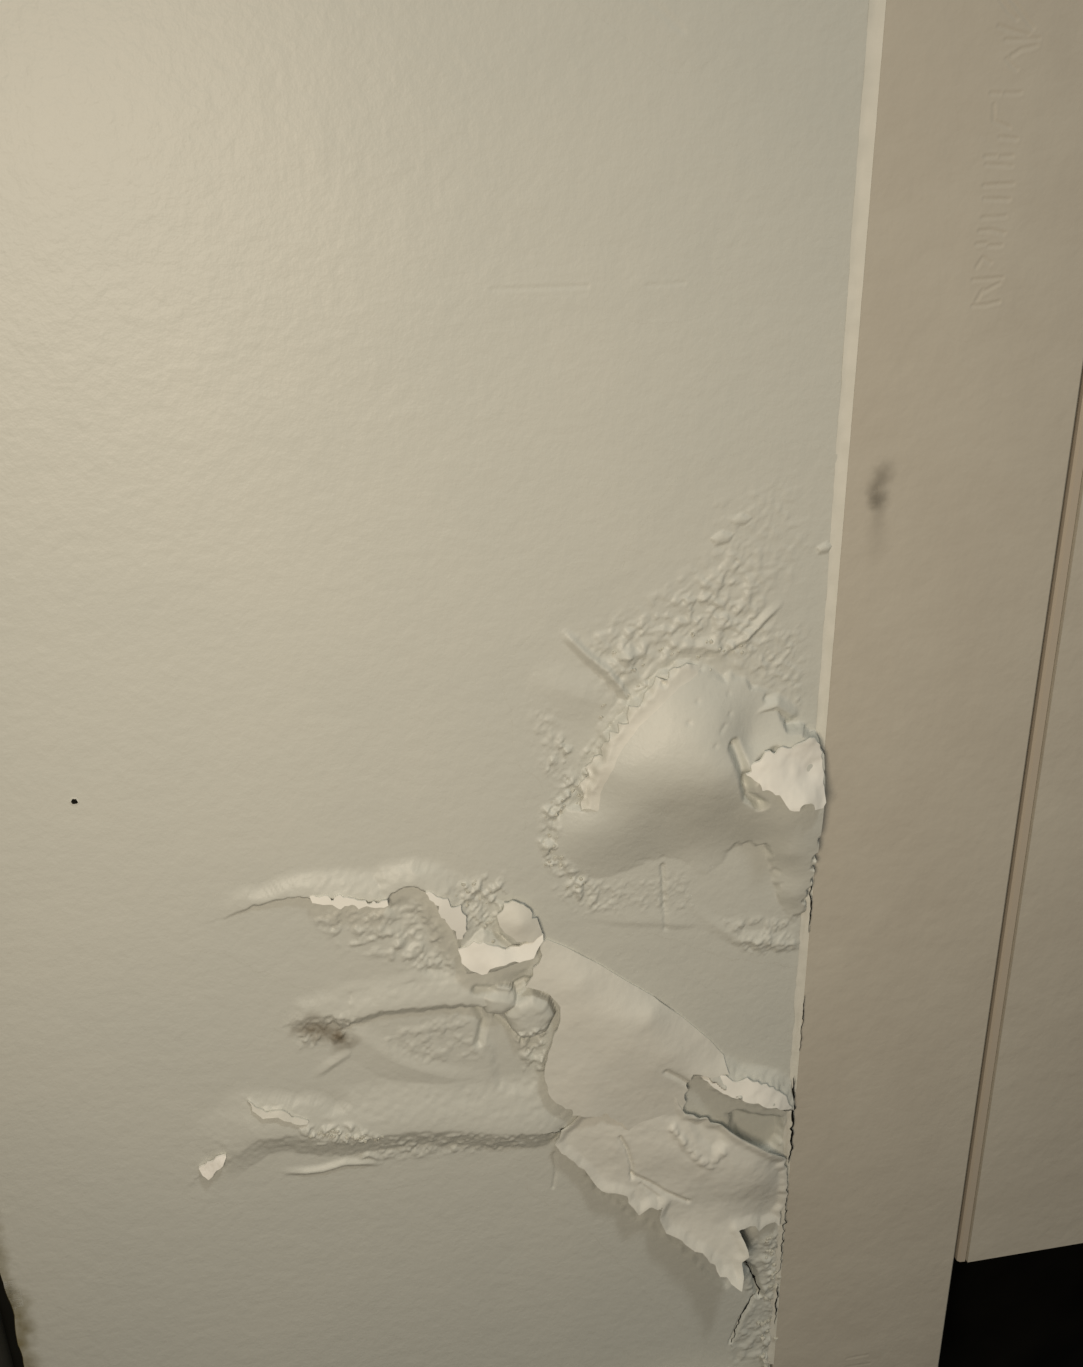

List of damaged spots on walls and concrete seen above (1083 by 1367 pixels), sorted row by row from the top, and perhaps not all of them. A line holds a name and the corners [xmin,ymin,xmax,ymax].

peeling [187,852,792,1367]